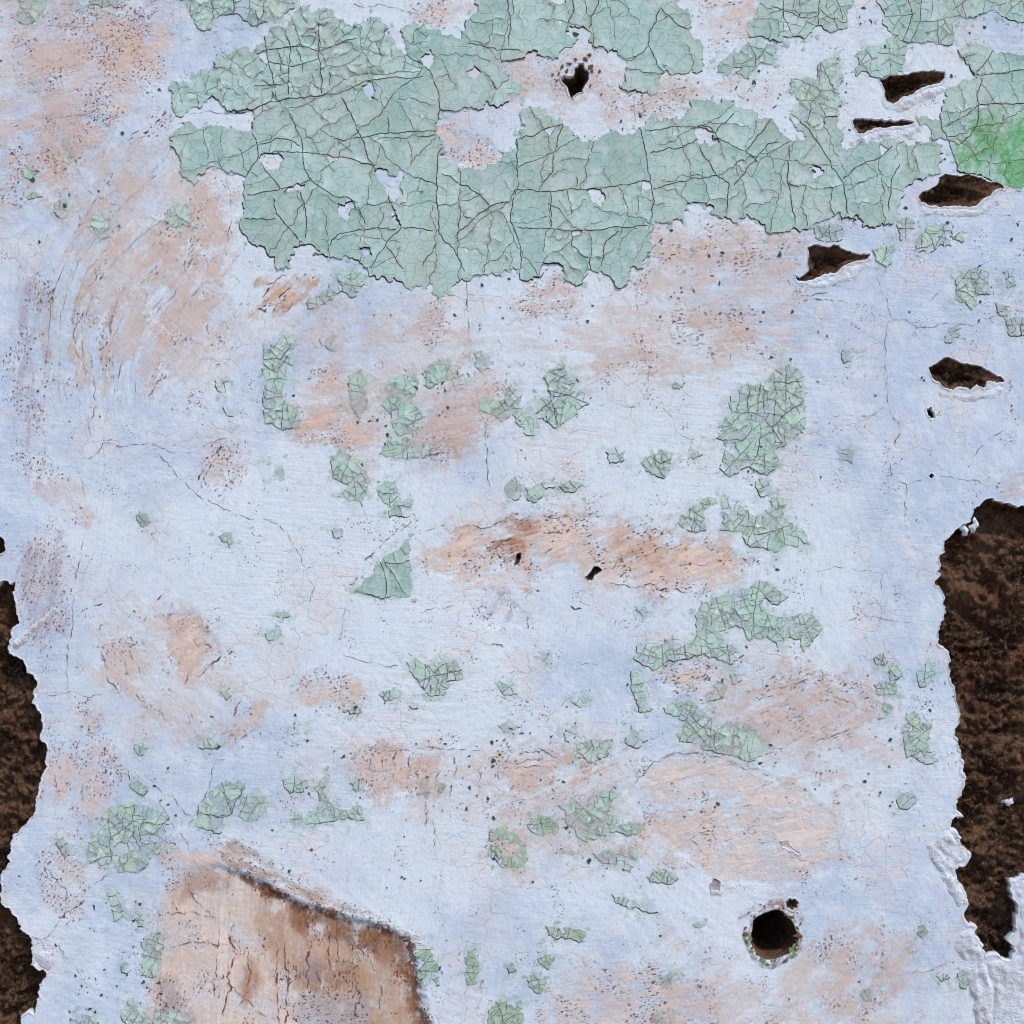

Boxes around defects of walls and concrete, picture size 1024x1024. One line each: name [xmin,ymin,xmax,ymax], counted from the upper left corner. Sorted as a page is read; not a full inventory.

peeling [157,0,1024,441]
flaking render [0,578,49,1024]
peeling [55,737,179,873]
flaking render [872,497,1024,963]
flaking render [94,860,489,1024]
spalling [746,896,803,969]
peeling [936,961,969,991]